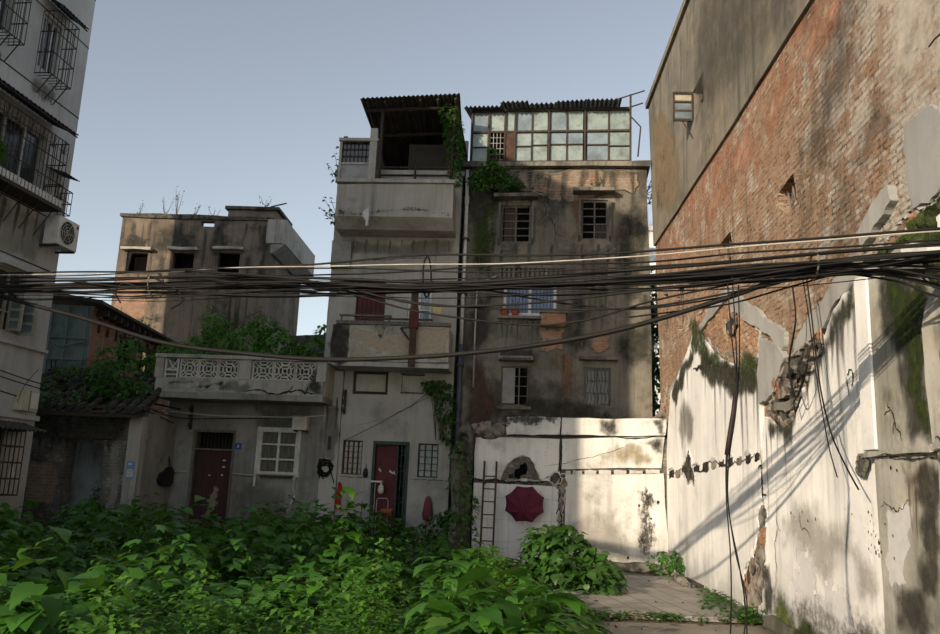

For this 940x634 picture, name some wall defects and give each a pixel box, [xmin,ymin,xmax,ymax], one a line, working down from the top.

spalling [515,168,640,202]
spalling [884,196,940,281]
crack [242,386,316,395]
spalling [696,300,761,363]
leakage [672,351,795,459]
spalling [766,328,824,428]
leakage [879,276,931,438]
spalling [500,455,568,525]
leakage [638,490,656,555]
spalling [668,448,700,486]
spalling [741,501,768,616]
peeling [868,504,912,587]